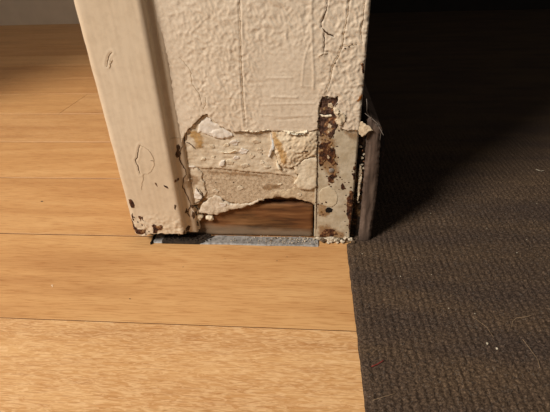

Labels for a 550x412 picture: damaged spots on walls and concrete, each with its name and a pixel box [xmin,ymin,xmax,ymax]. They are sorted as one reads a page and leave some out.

crack [318,2,365,91]
peeling [131,215,162,235]
crack [171,58,207,217]
flaking render [175,114,338,229]
rust [318,96,356,237]
flaking render [349,121,373,238]